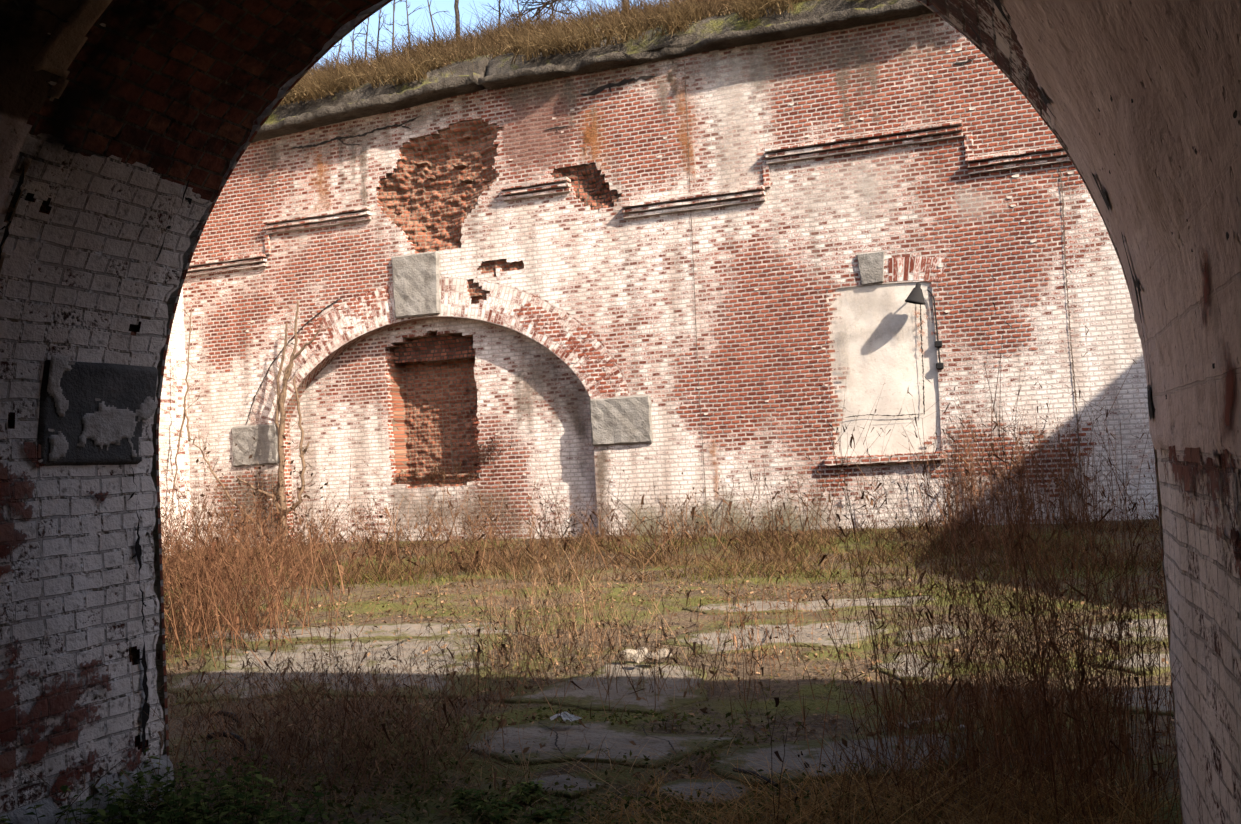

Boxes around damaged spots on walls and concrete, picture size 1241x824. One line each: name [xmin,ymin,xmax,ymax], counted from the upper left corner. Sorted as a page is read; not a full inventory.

peeling [0,157,52,272]
peeling [0,355,157,580]
peeling [0,636,157,804]
spalling [128,321,141,336]
crack [127,467,150,762]
spalling [196,70,700,414]
crack [581,61,708,525]
peeling [672,233,857,499]
peeling [1161,445,1241,583]